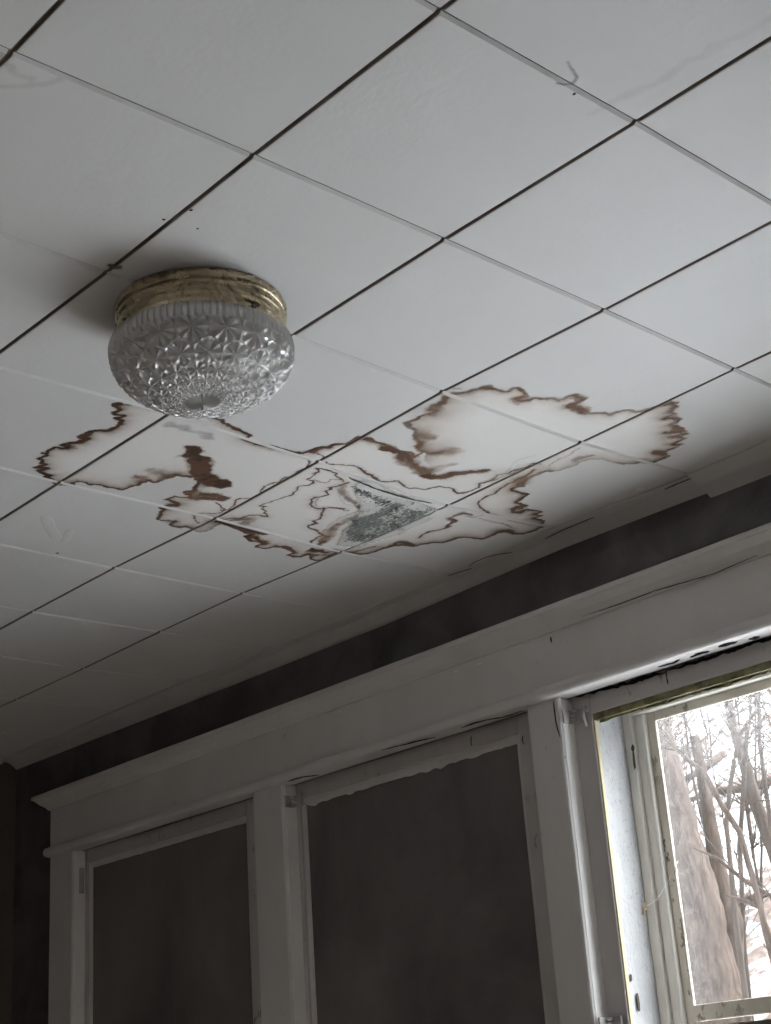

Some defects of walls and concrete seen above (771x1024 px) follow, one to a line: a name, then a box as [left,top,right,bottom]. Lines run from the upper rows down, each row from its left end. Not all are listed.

damp [32,385,688,561]